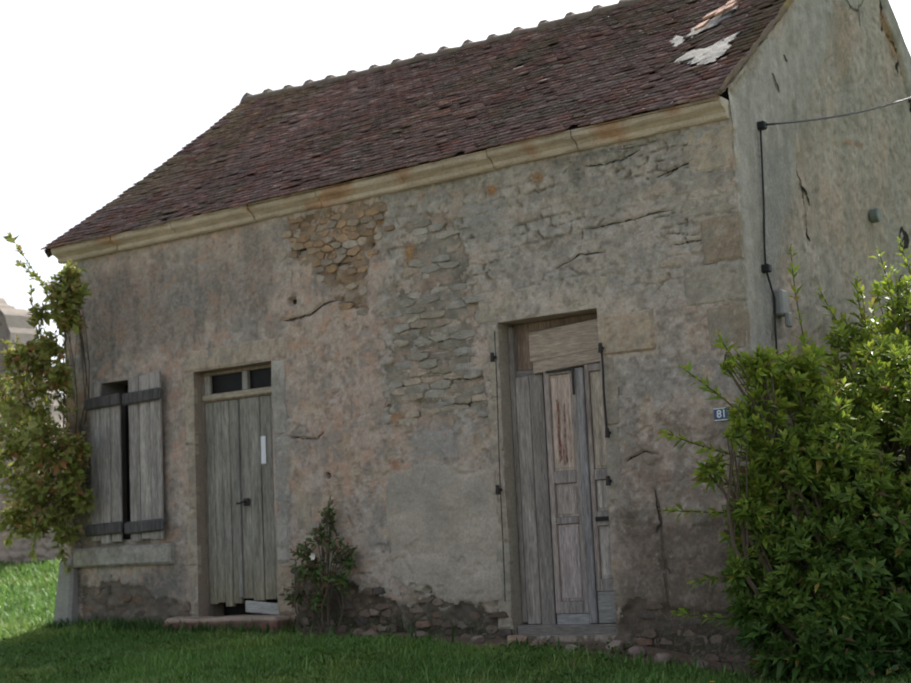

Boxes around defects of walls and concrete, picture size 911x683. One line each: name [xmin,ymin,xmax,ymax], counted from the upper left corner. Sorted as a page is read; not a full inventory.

peeling [671,0,739,65]
crack [796,164,810,241]
crack [285,263,360,321]
peeling [277,204,395,316]
flaking render [408,223,462,268]
flaking render [392,283,489,426]